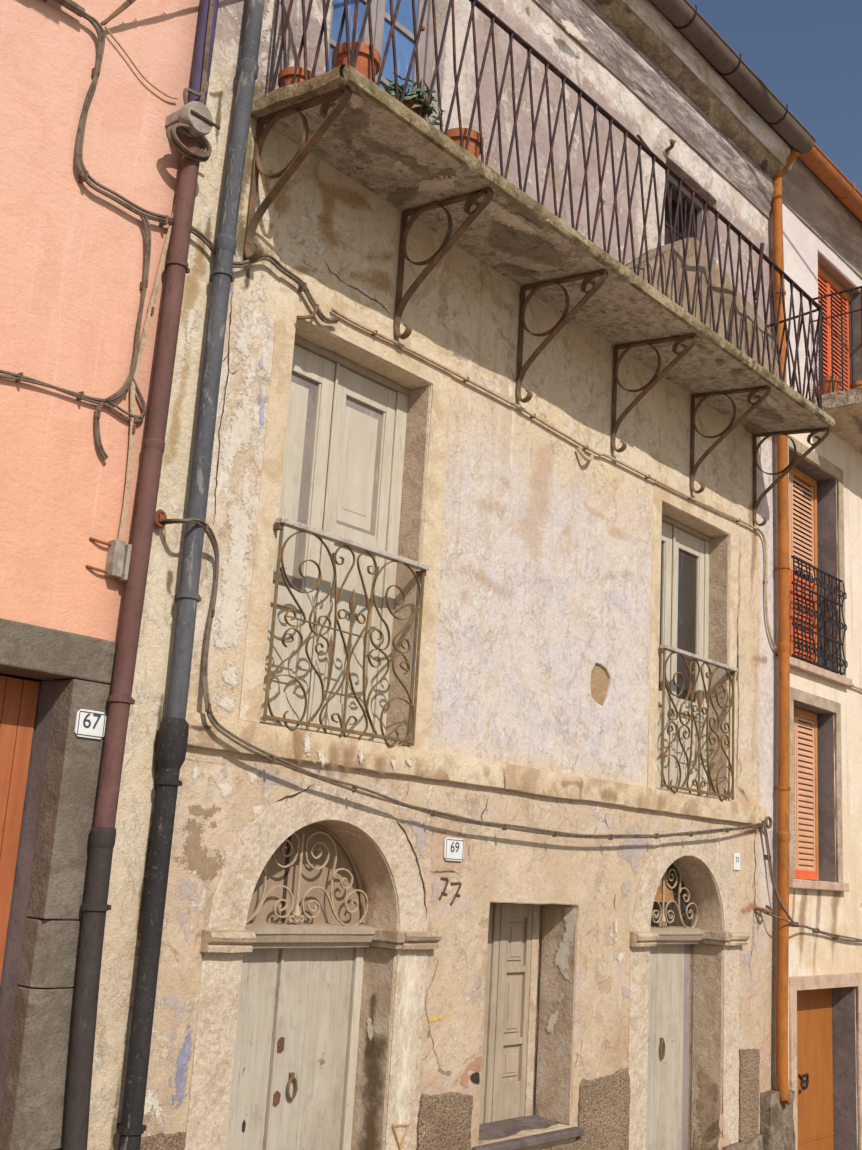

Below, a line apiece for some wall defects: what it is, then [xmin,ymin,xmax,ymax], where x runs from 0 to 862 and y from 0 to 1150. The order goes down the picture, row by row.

flaking render [560,19,589,42]
crack [324,260,391,315]
crack [213,292,238,524]
flaking render [214,280,267,649]
flaking render [217,663,242,712]
spalling [174,762,233,883]
flaking render [247,766,299,791]
peeling [144,994,192,1128]
water stain [362,994,386,1150]
water stain [396,958,417,1124]
crack [421,963,440,1065]